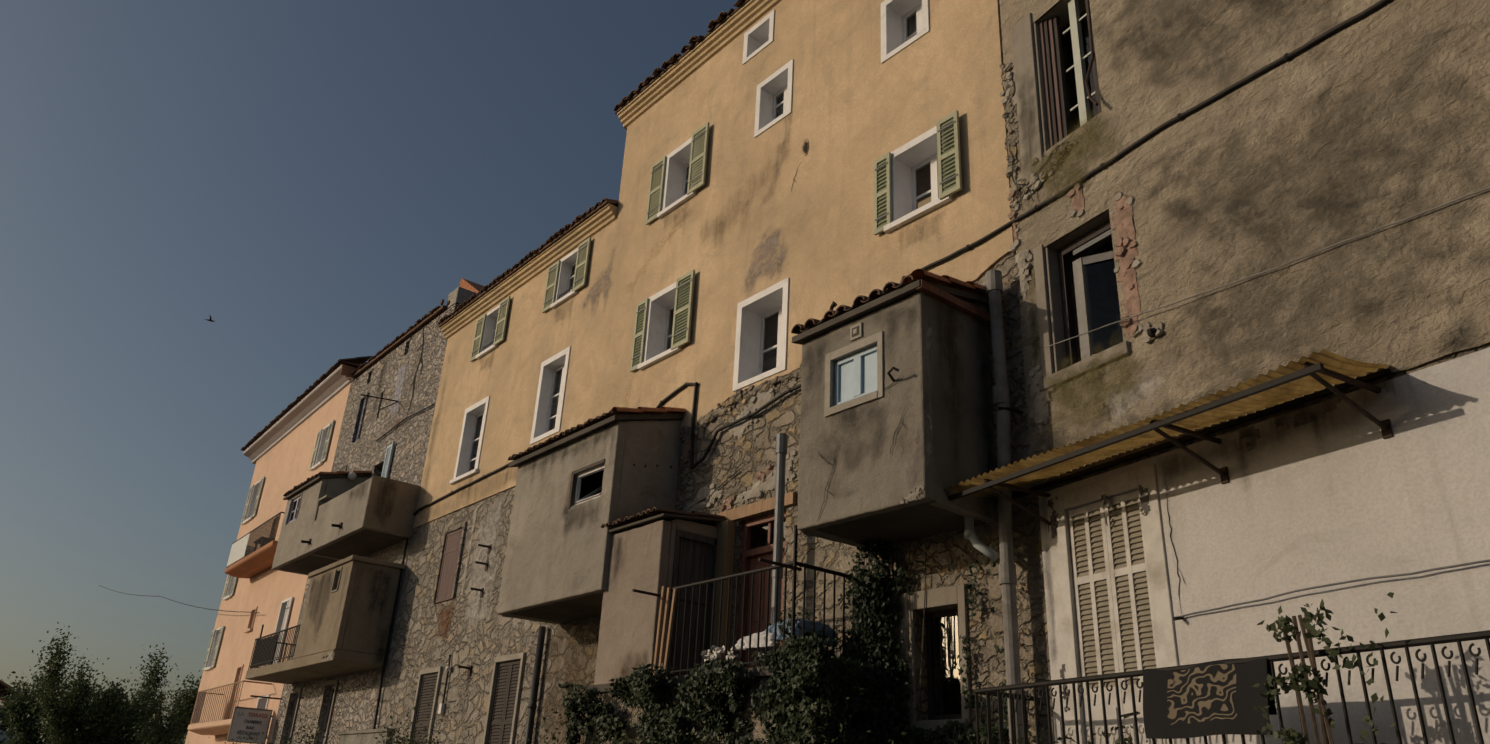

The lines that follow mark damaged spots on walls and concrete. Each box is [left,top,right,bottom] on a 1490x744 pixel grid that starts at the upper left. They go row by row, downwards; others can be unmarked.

flaking render [1111,192,1165,344]